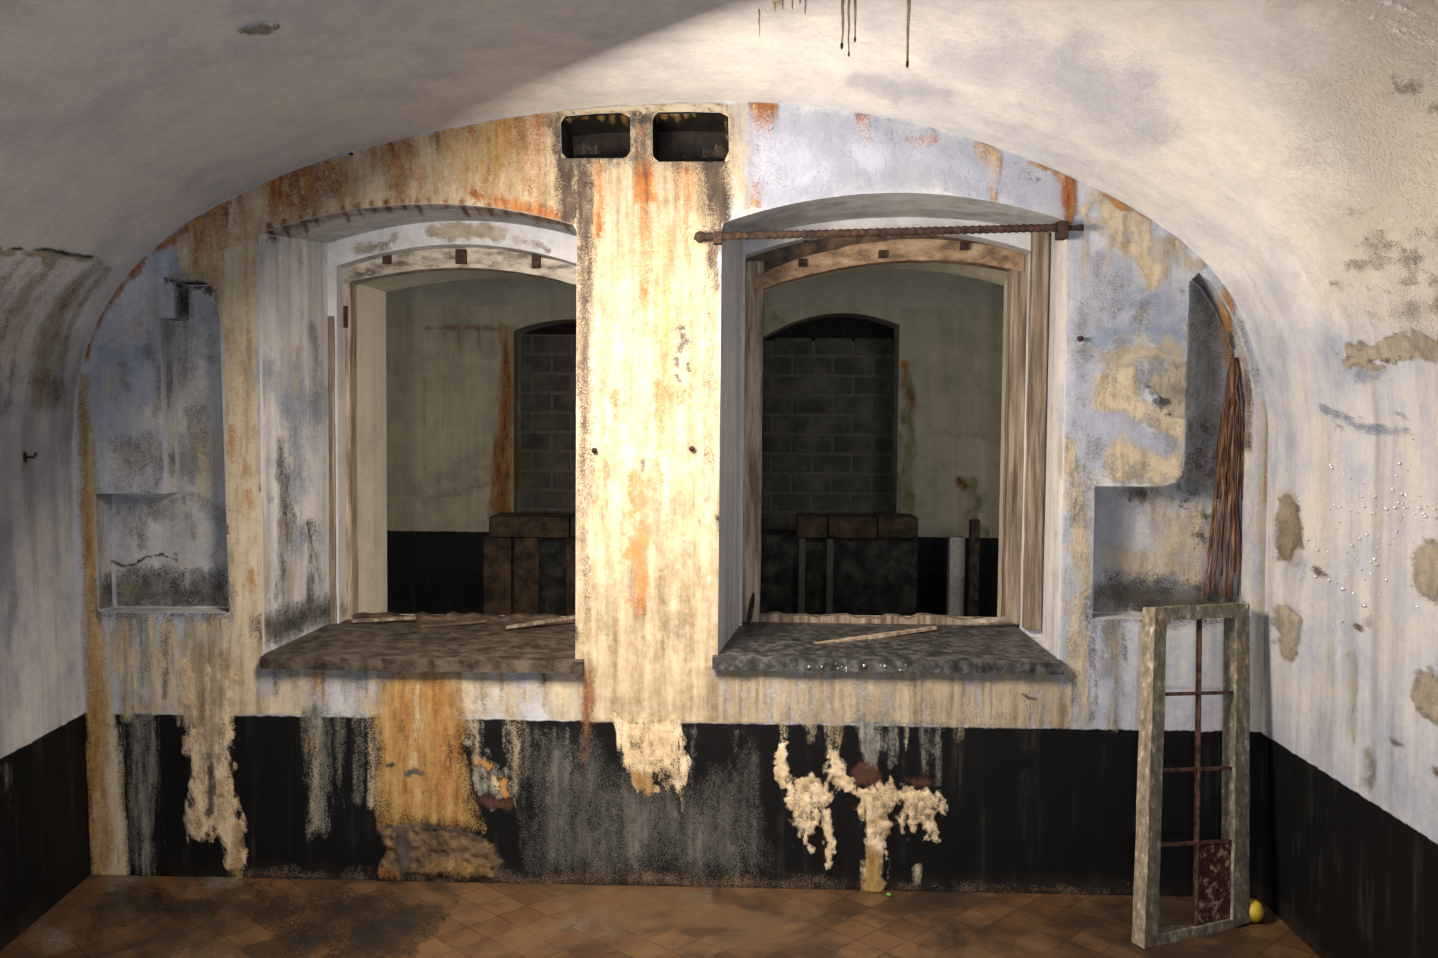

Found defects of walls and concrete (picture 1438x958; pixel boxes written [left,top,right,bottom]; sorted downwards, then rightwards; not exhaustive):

corrosion [84,104,737,364]
corrosion [747,102,779,208]
damp [837,0,1196,166]
damp [1241,0,1438,347]
peeling [1329,207,1438,384]
flaking render [1371,63,1438,114]
damp [1316,403,1411,443]
damp [0,102,1267,958]
corrosion [622,455,669,622]
flaking render [1273,489,1326,578]
corrosion [366,671,487,835]
flaking render [1409,665,1438,725]